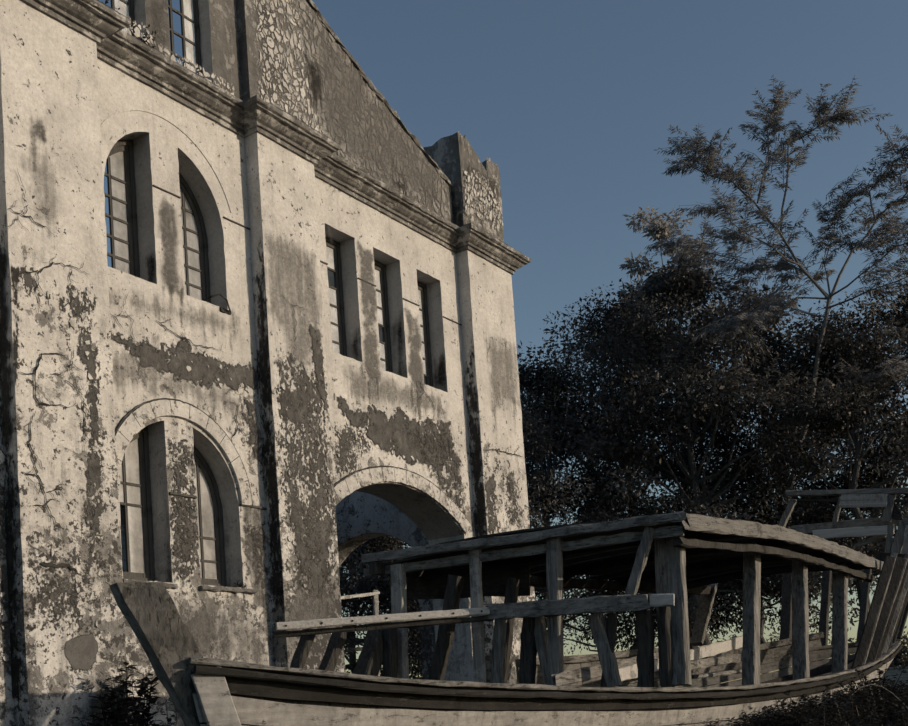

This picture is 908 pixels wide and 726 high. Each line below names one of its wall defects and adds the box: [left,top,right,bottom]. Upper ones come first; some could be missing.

water stain [33,121,51,220]
crack [3,169,90,316]
water stain [147,204,218,325]
water stain [268,239,319,363]
flaking render [7,266,107,671]
crack [18,351,101,572]
flaking render [111,323,263,465]
flaking render [274,324,465,604]
flaking render [0,468,12,669]